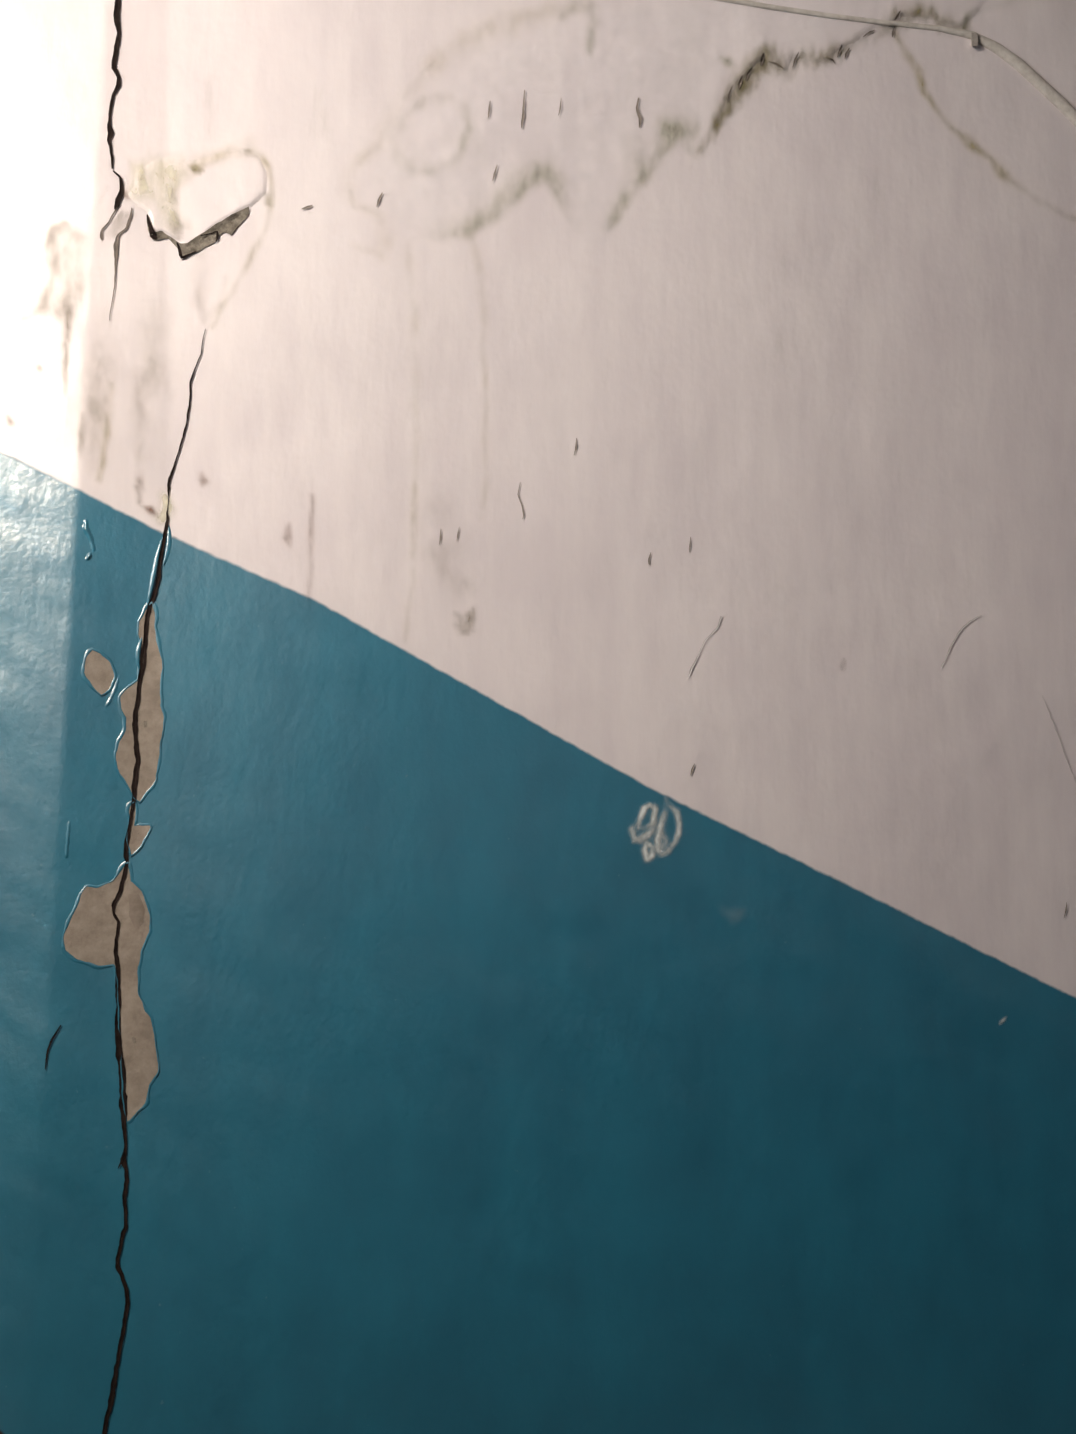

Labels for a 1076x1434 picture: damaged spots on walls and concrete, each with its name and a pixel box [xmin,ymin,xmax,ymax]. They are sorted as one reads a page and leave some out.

crack [100,0,132,321]
flaking render [146,207,249,259]
leakage [713,48,799,130]
peeling [61,602,167,1124]
crack [102,329,206,1434]
crack [45,1025,61,1070]